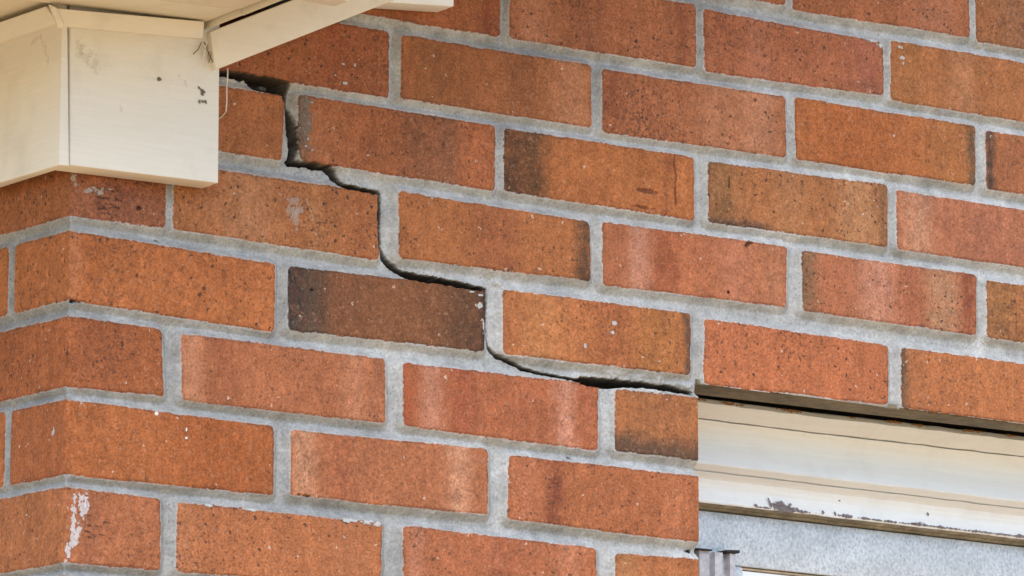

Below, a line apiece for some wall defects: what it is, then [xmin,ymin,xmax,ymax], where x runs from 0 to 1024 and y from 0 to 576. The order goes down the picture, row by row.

crack [219,67,699,399]
peeling [754,498,1024,538]